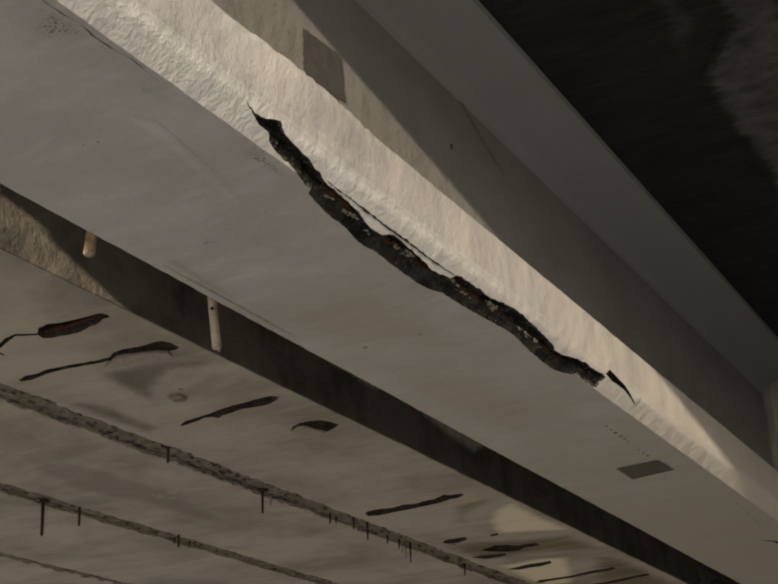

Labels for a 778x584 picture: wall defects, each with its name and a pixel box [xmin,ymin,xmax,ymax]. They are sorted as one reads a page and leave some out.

spalling [244,97,605,388]
spalling [37,313,109,338]
spalling [19,341,179,382]
spalling [181,396,279,426]
spalling [291,420,338,436]
spalling [365,494,463,516]
spalling [443,537,467,547]
spalling [472,533,539,559]
spalling [511,561,552,570]
spalling [538,567,649,584]